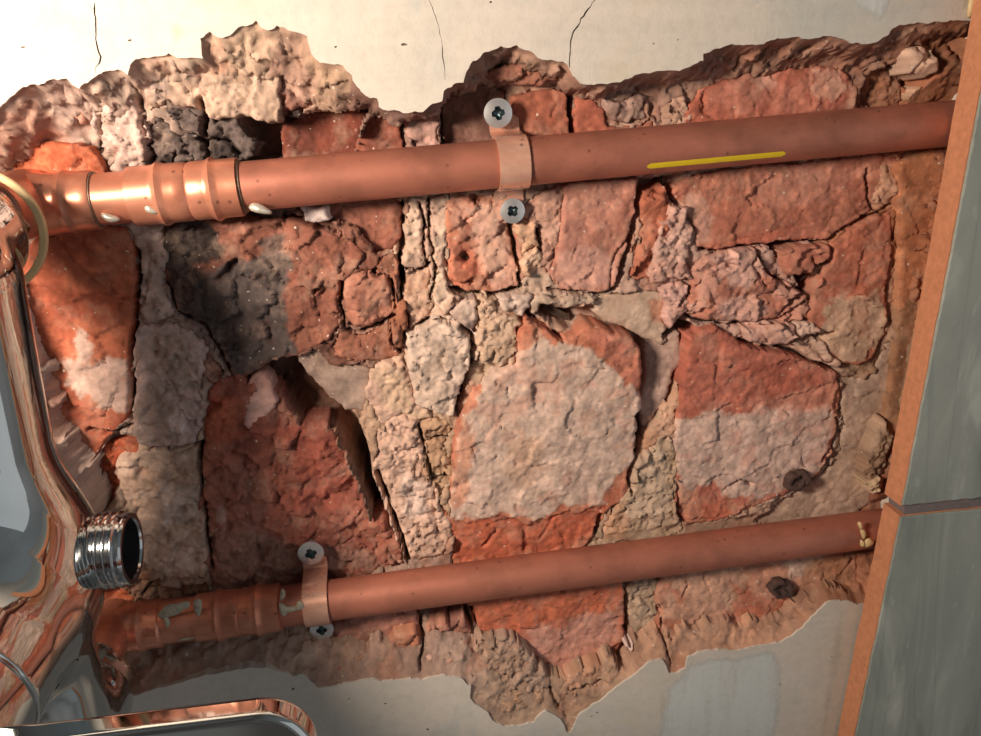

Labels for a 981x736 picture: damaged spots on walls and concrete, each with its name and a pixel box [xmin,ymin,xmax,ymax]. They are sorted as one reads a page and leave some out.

spalling [0,20,970,173]
crack [569,0,595,68]
spalling [23,147,947,602]
spalling [121,548,875,731]